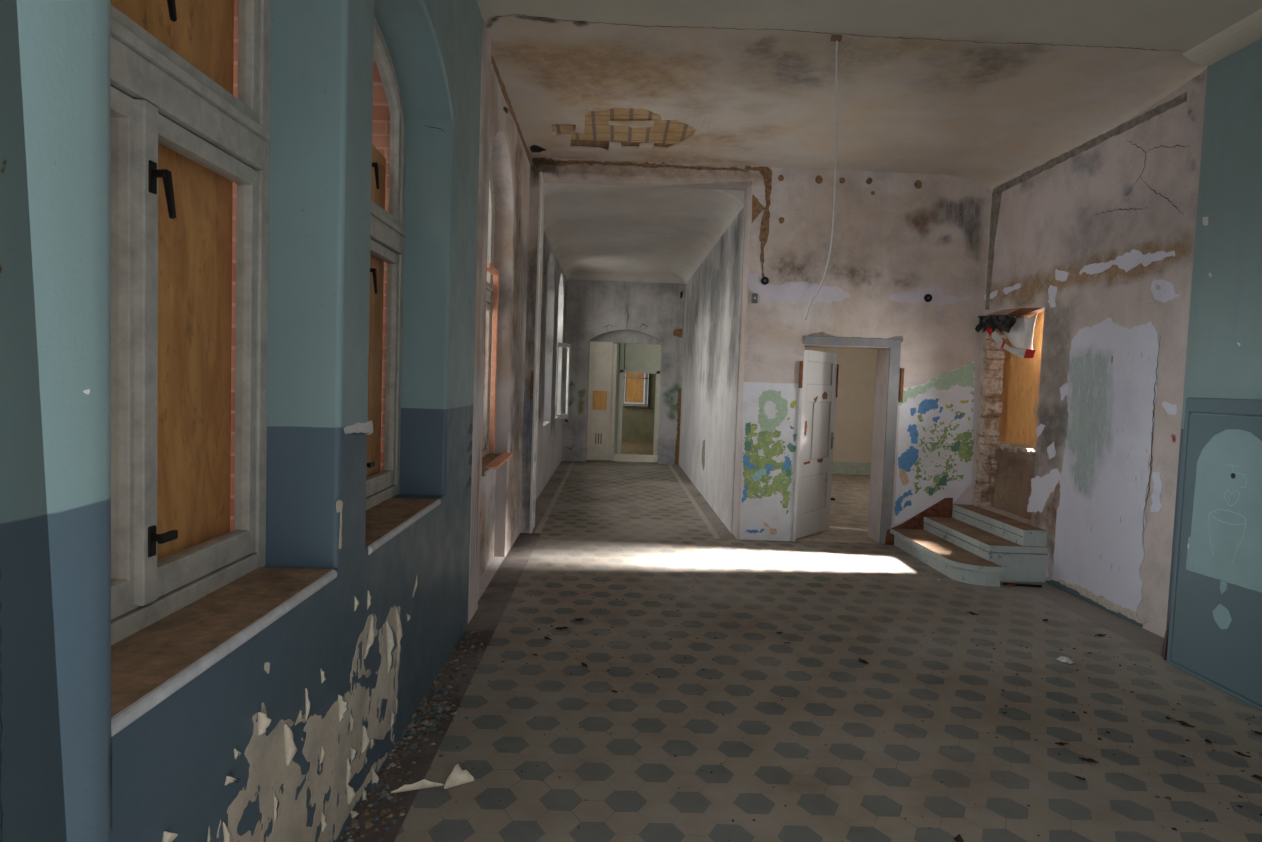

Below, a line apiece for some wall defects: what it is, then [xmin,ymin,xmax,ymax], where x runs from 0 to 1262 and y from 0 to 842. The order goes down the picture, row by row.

flaking render [551,108,696,144]
crack [1093,140,1189,215]
peeling [1045,318,1160,627]
peeling [207,590,411,842]
peeling [162,831,178,842]